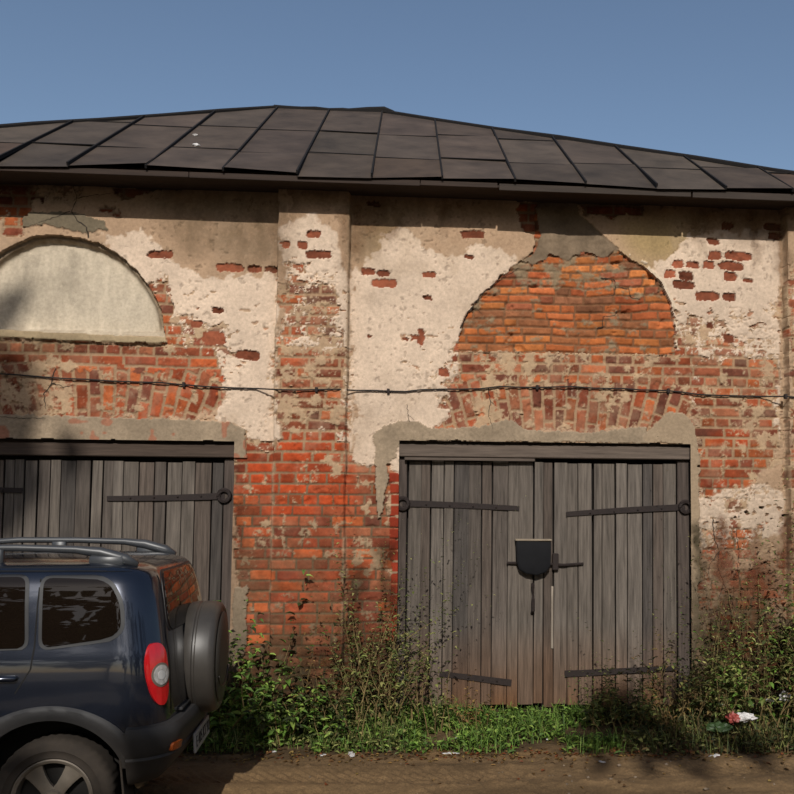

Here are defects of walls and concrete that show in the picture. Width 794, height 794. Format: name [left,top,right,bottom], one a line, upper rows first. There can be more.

flaking render [0,184,48,237]
crack [41,187,108,238]
flaking render [147,249,173,259]
flaking render [460,229,485,238]
flaking render [516,201,537,235]
flaking render [579,204,645,219]
flaking render [763,222,785,240]
flaking render [0,274,260,420]
flaking render [403,328,426,350]
crack [0,368,71,419]
flaking render [216,229,399,715]
flaking render [428,237,794,671]